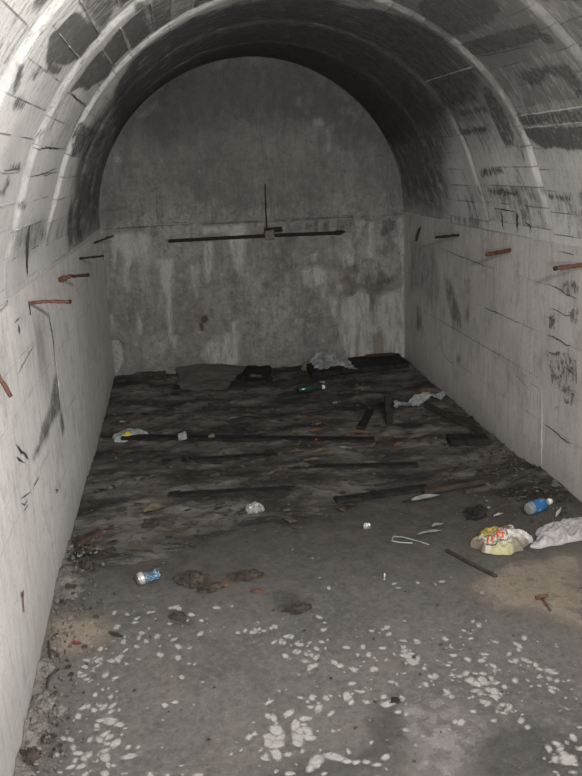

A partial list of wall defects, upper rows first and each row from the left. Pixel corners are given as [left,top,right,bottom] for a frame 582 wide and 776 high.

leakage [203,224,245,276]
leakage [205,322,238,365]